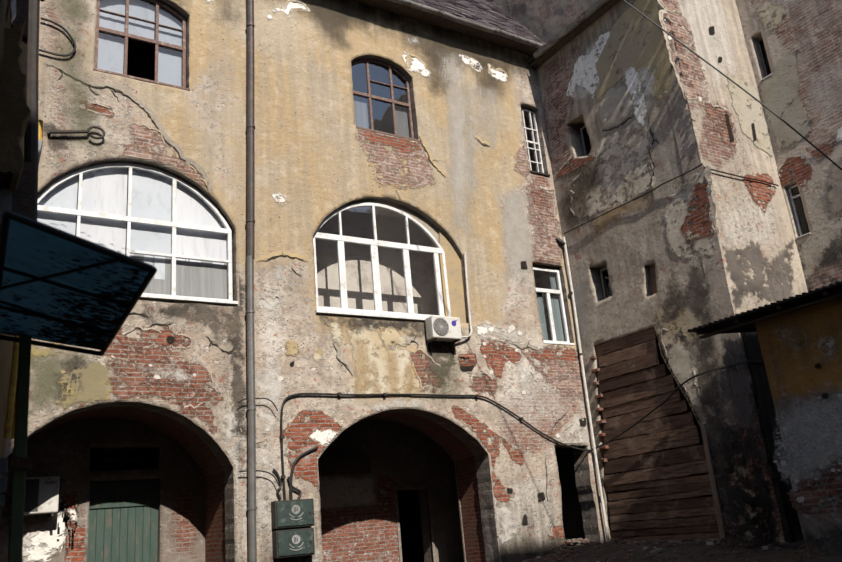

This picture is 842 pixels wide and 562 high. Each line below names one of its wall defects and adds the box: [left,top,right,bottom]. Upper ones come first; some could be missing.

crack [46,60,213,191]
flaking render [122,122,209,187]
flaking render [459,54,509,83]
flaking render [545,0,737,220]
flaking render [663,166,719,260]
damp [723,239,810,308]
flaking render [743,126,842,219]
damp [819,230,842,267]
flaking render [456,320,585,402]
flaking render [91,323,246,499]
flaking render [255,361,343,532]
flaking render [452,405,528,546]